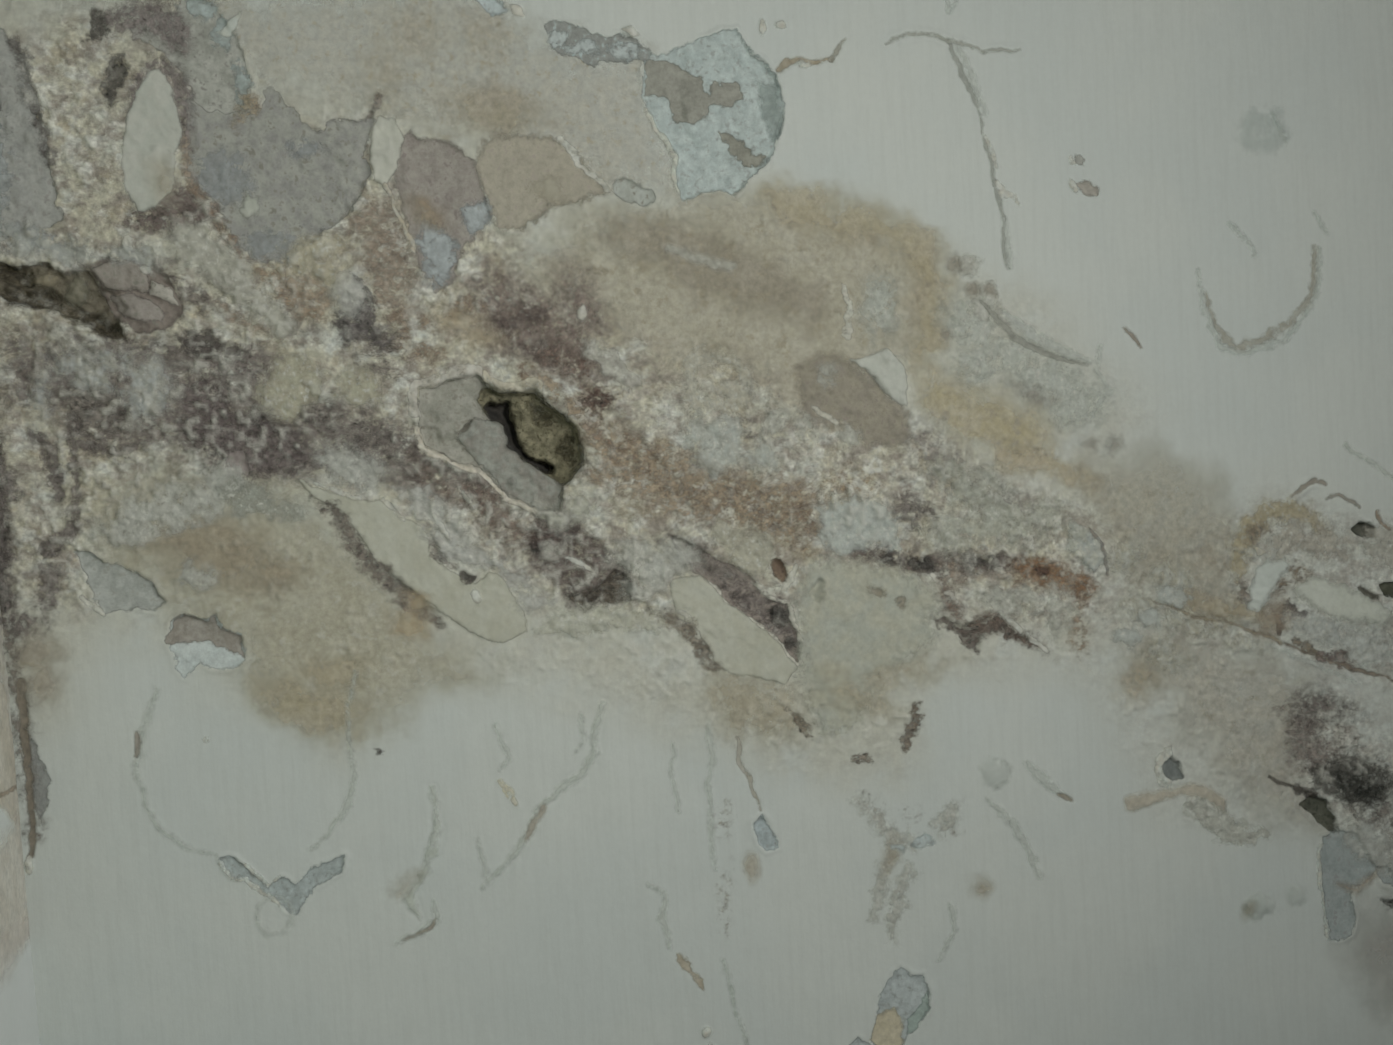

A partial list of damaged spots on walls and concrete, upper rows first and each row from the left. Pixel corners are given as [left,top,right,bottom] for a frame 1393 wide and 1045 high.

crack [0,641,53,874]
spalling [0,28,183,339]
water stain [90,1,195,151]
spalling [121,0,492,293]
water stain [0,183,774,948]
hole [408,364,584,514]
peeling [544,21,785,201]
water stain [479,190,1102,476]
crack [893,33,1019,265]
water stain [818,431,1142,604]
crack [1203,222,1322,354]
crack [1155,602,1393,681]